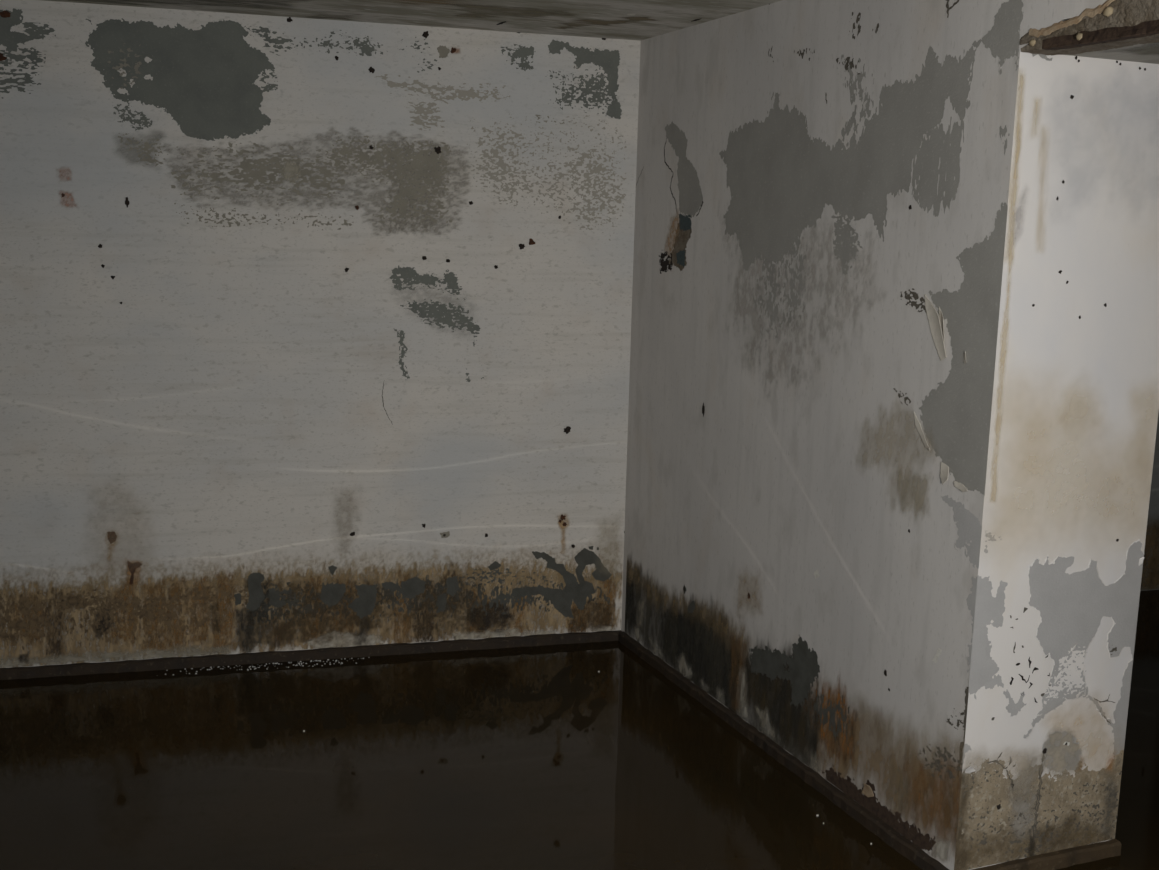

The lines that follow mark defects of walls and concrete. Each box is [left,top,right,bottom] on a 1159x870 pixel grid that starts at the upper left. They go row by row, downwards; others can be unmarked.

peeling [0,8,56,99]
peeling [85,17,643,241]
peeling [659,121,704,274]
peeling [719,0,1159,342]
peeling [393,328,410,380]
peeling [389,256,480,346]
corrosion [107,532,117,559]
water stain [0,566,565,667]
corrosion [0,561,623,667]
water stain [570,562,820,771]